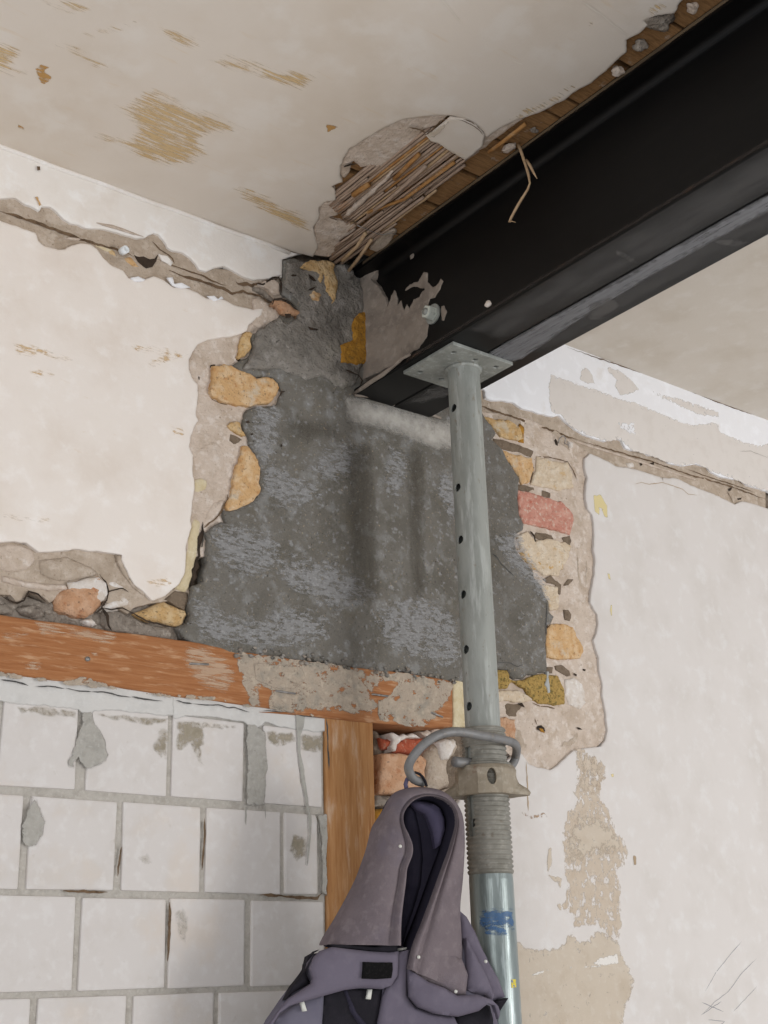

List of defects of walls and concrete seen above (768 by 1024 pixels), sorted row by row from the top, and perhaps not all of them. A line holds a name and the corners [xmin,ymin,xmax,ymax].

spalling [0,197,300,640]
flaking render [340,312,366,365]
spalling [300,115,524,304]
spalling [481,367,768,1024]